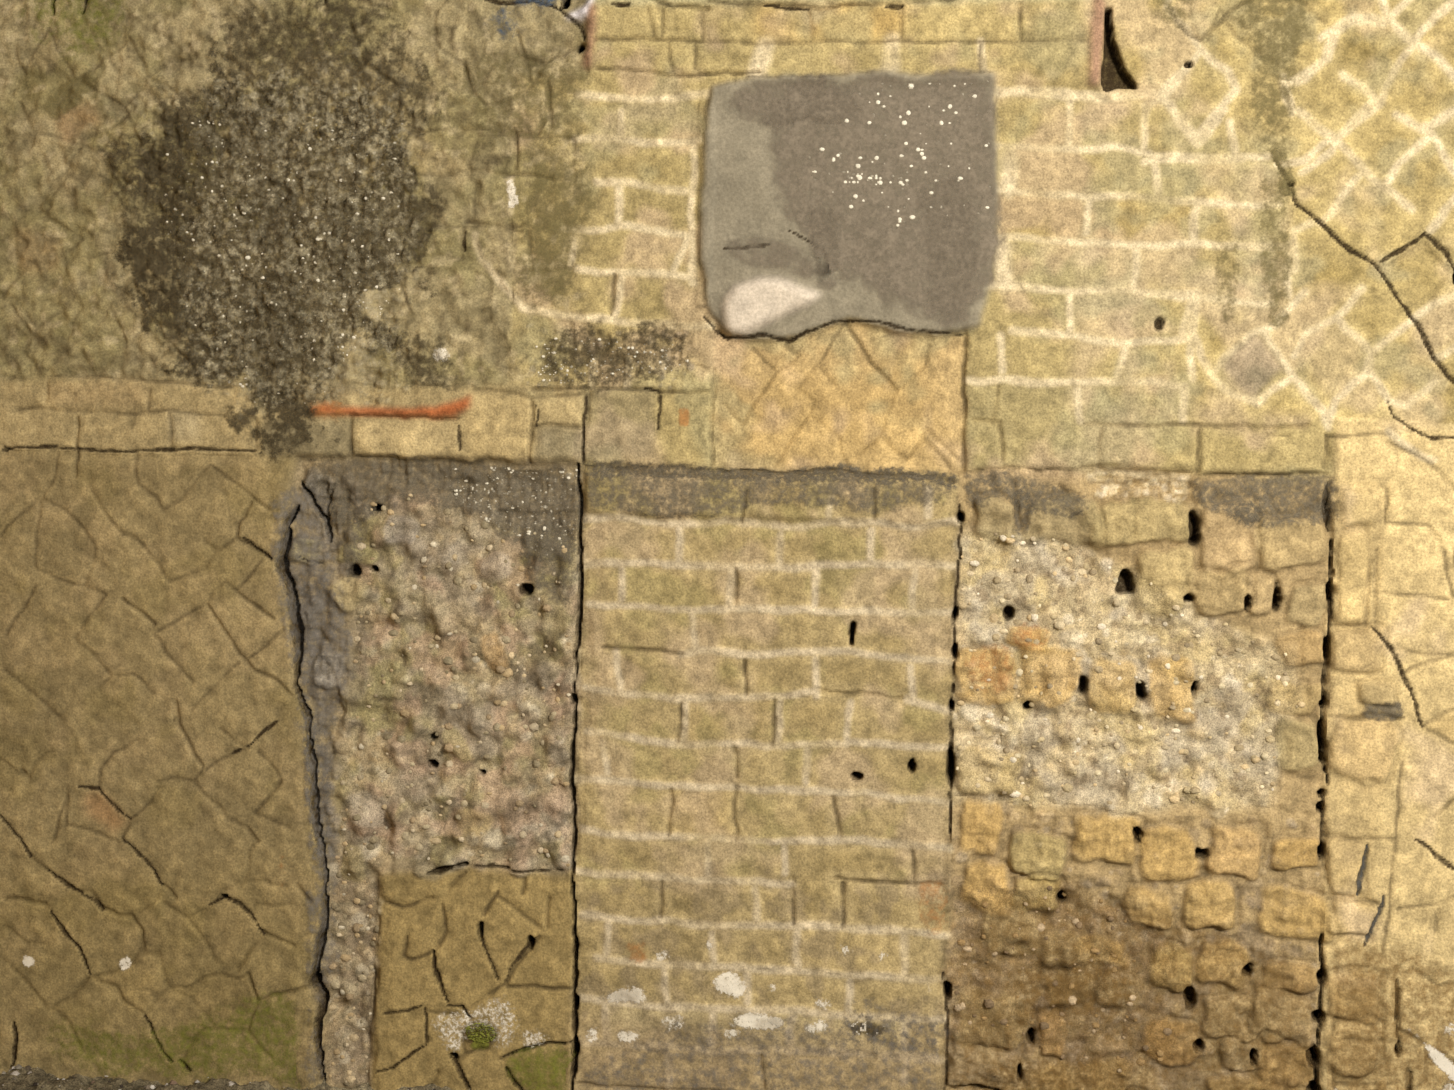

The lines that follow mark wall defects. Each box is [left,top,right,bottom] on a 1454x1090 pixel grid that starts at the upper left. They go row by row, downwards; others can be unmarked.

damp [102,0,595,457]
damp [535,322,689,393]
damp [732,69,1001,325]
crack [1277,165,1454,383]
crack [233,484,335,1080]
spalling [320,492,579,1087]
crack [428,396,588,1090]
damp [273,455,1084,983]
crack [946,504,964,834]
spalling [955,529,1305,820]
crack [1316,482,1333,859]
spalling [951,881,1182,1076]